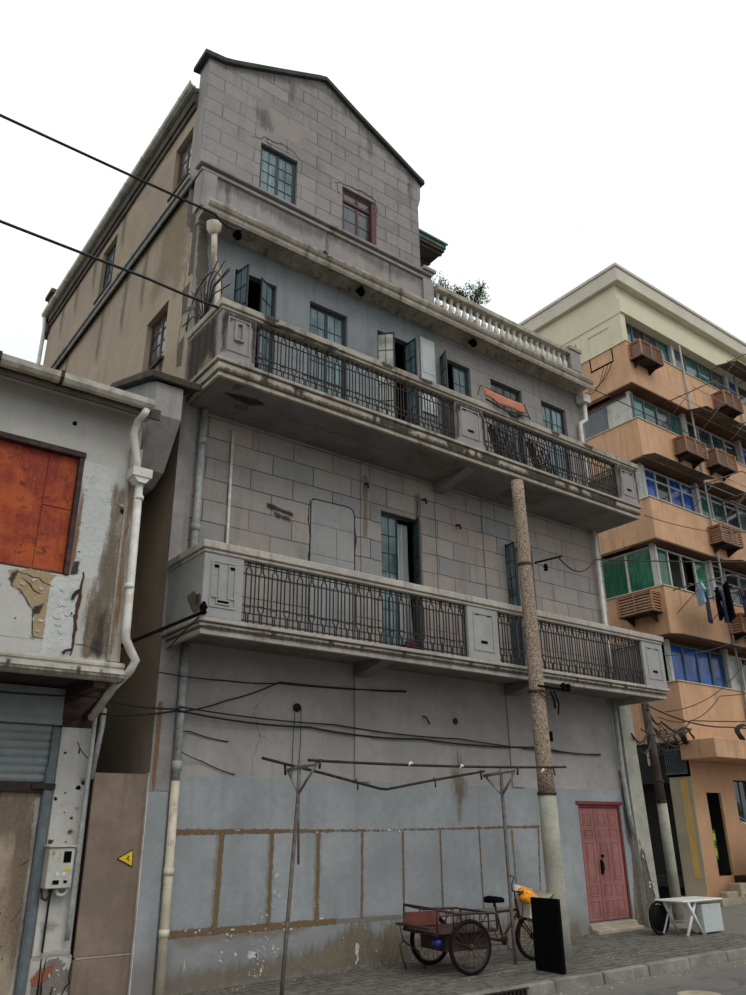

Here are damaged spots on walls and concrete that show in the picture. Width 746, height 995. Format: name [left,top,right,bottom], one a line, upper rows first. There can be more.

spalling [9,568,56,639]
damp [77,481,131,674]
spalling [1,797,41,995]
peeling [30,951,72,995]
peeling [215,873,293,978]